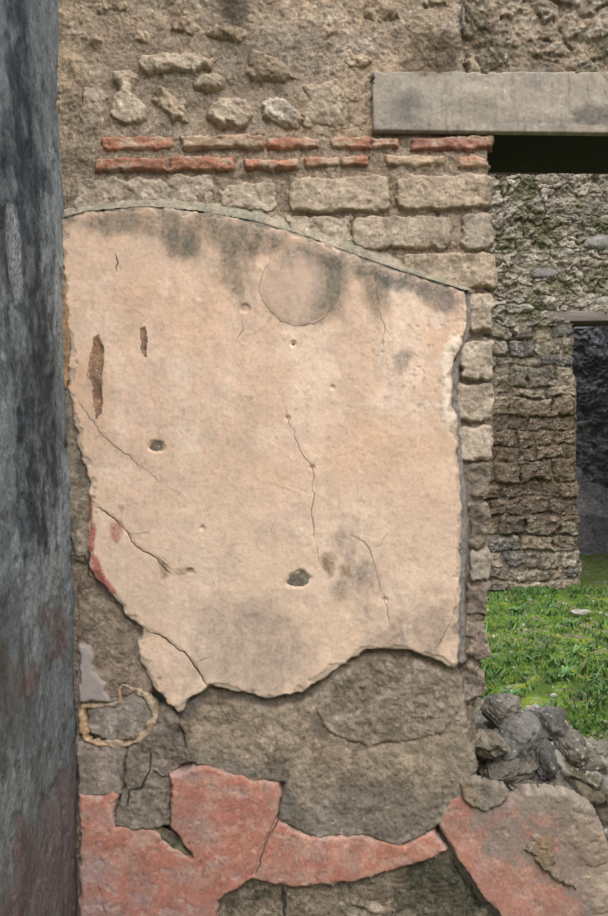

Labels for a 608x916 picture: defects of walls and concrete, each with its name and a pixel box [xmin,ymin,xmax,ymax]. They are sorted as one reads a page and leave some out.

damp [162,213,281,269]
damp [320,257,407,301]
damp [140,326,148,357]
damp [86,335,104,419]
crack [77,399,159,482]
crack [282,396,319,561]
crack [95,506,185,576]
spalling [62,266,479,856]
crack [72,555,209,686]
crack [125,751,171,807]
crack [279,887,287,916]
spalling [337,875,441,916]